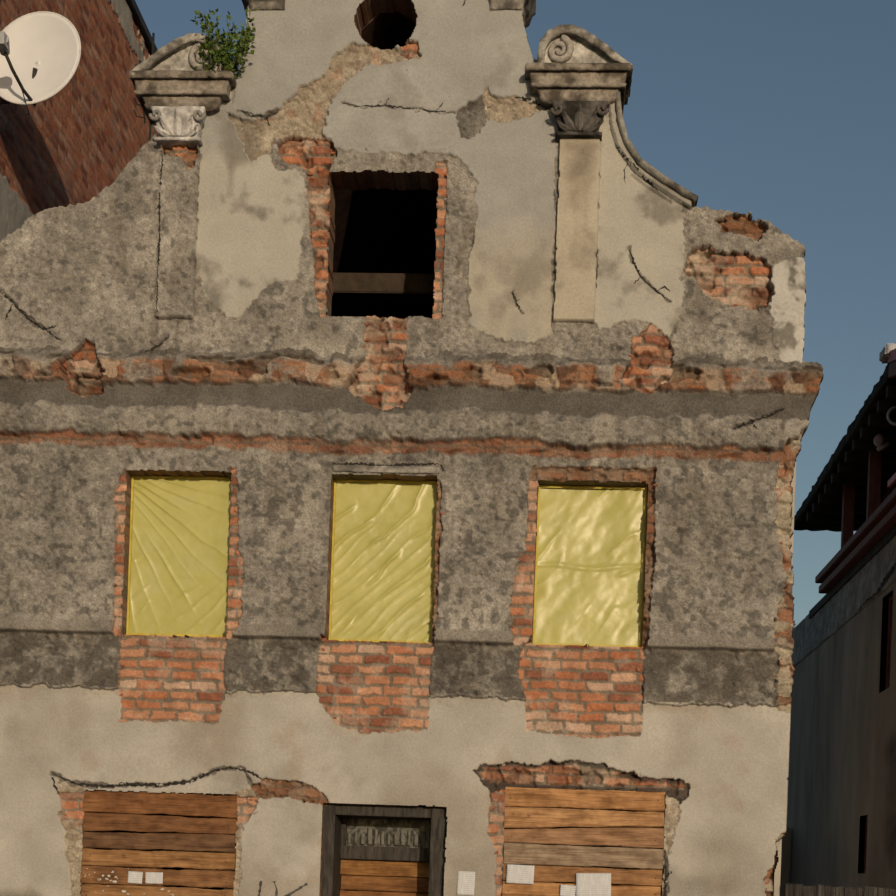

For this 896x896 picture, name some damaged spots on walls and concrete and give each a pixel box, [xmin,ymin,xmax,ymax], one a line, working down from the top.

spalling [229,41,422,318]
crack [1,292,59,340]
spalling [348,315,414,411]
crack [629,250,671,302]
spalling [685,245,776,312]
spalling [112,468,245,725]
spalling [317,480,445,734]
spalling [510,466,659,739]
crack [855,563,896,614]
spalling [56,779,86,896]
spalling [233,778,329,896]
spalling [473,760,691,896]